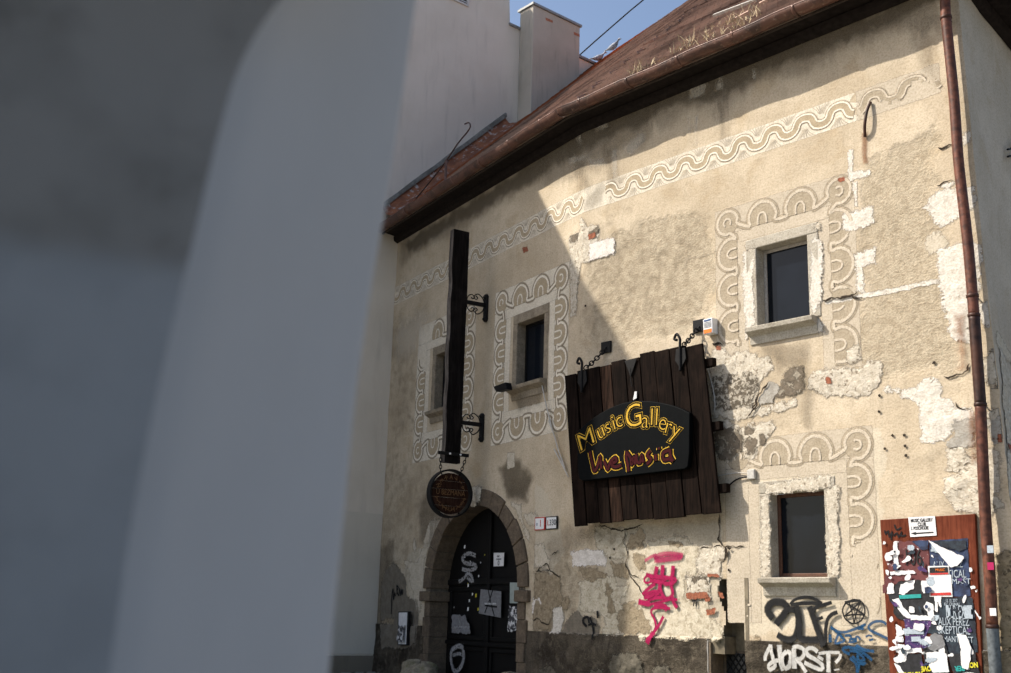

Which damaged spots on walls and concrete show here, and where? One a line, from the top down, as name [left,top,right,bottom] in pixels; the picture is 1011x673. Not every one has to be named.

spalling [923,181,978,227]
spalling [568,217,616,317]
crack [823,279,938,304]
spalling [936,241,990,344]
spalling [707,246,900,462]
peeling [404,517,441,611]
peeling [511,502,730,642]
crack [599,524,646,600]
spalling [994,549,1011,650]